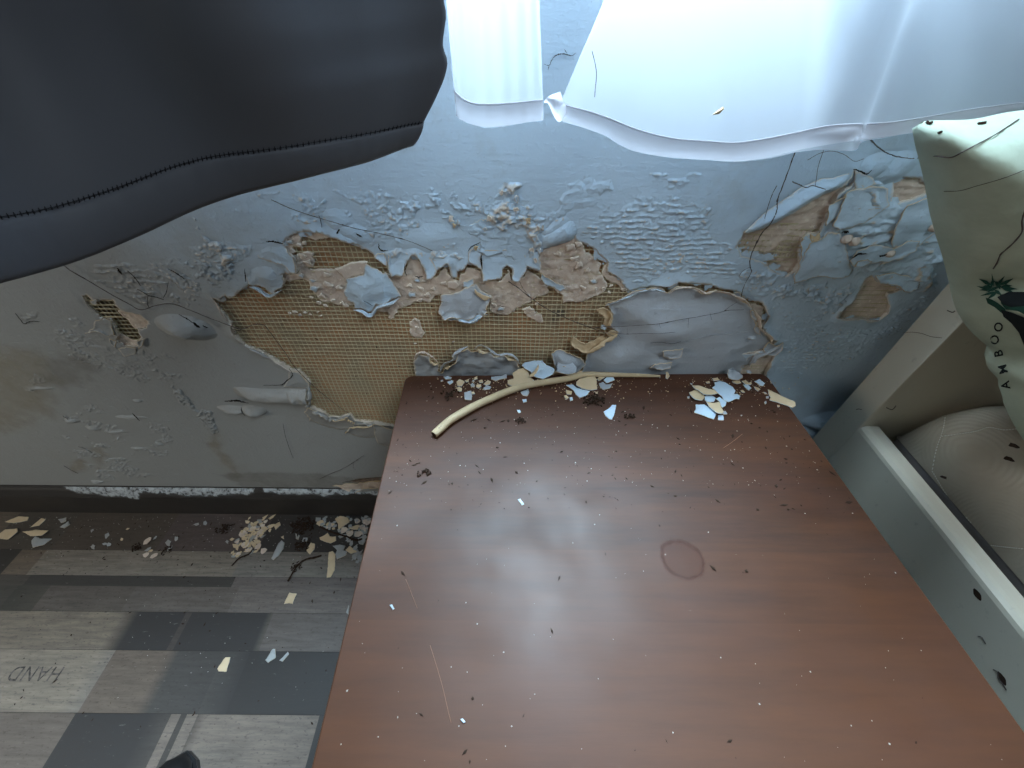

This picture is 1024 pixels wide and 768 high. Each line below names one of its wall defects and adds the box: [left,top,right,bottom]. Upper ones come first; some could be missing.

peeling [84,295,148,357]
crack [117,268,184,307]
peeling [214,217,796,447]
peeling [738,150,944,319]